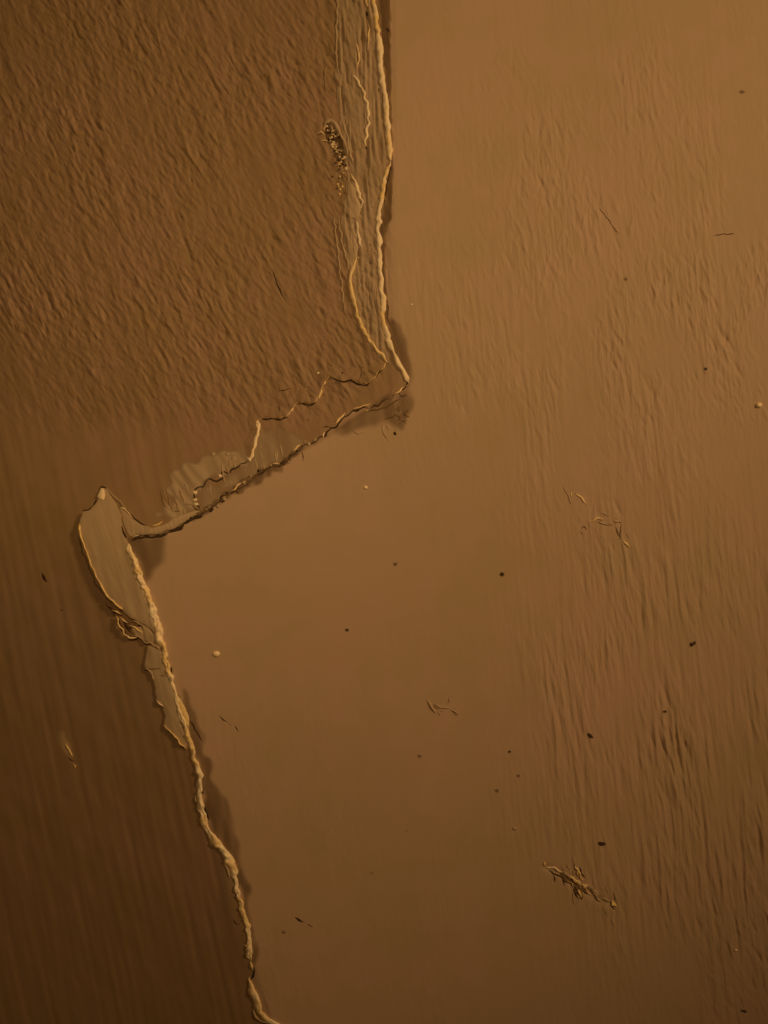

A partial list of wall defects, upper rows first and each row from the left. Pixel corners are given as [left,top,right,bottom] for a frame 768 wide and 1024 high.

peeling [317,0,390,364]
peeling [78,422,303,749]
spalling [544,862,617,927]